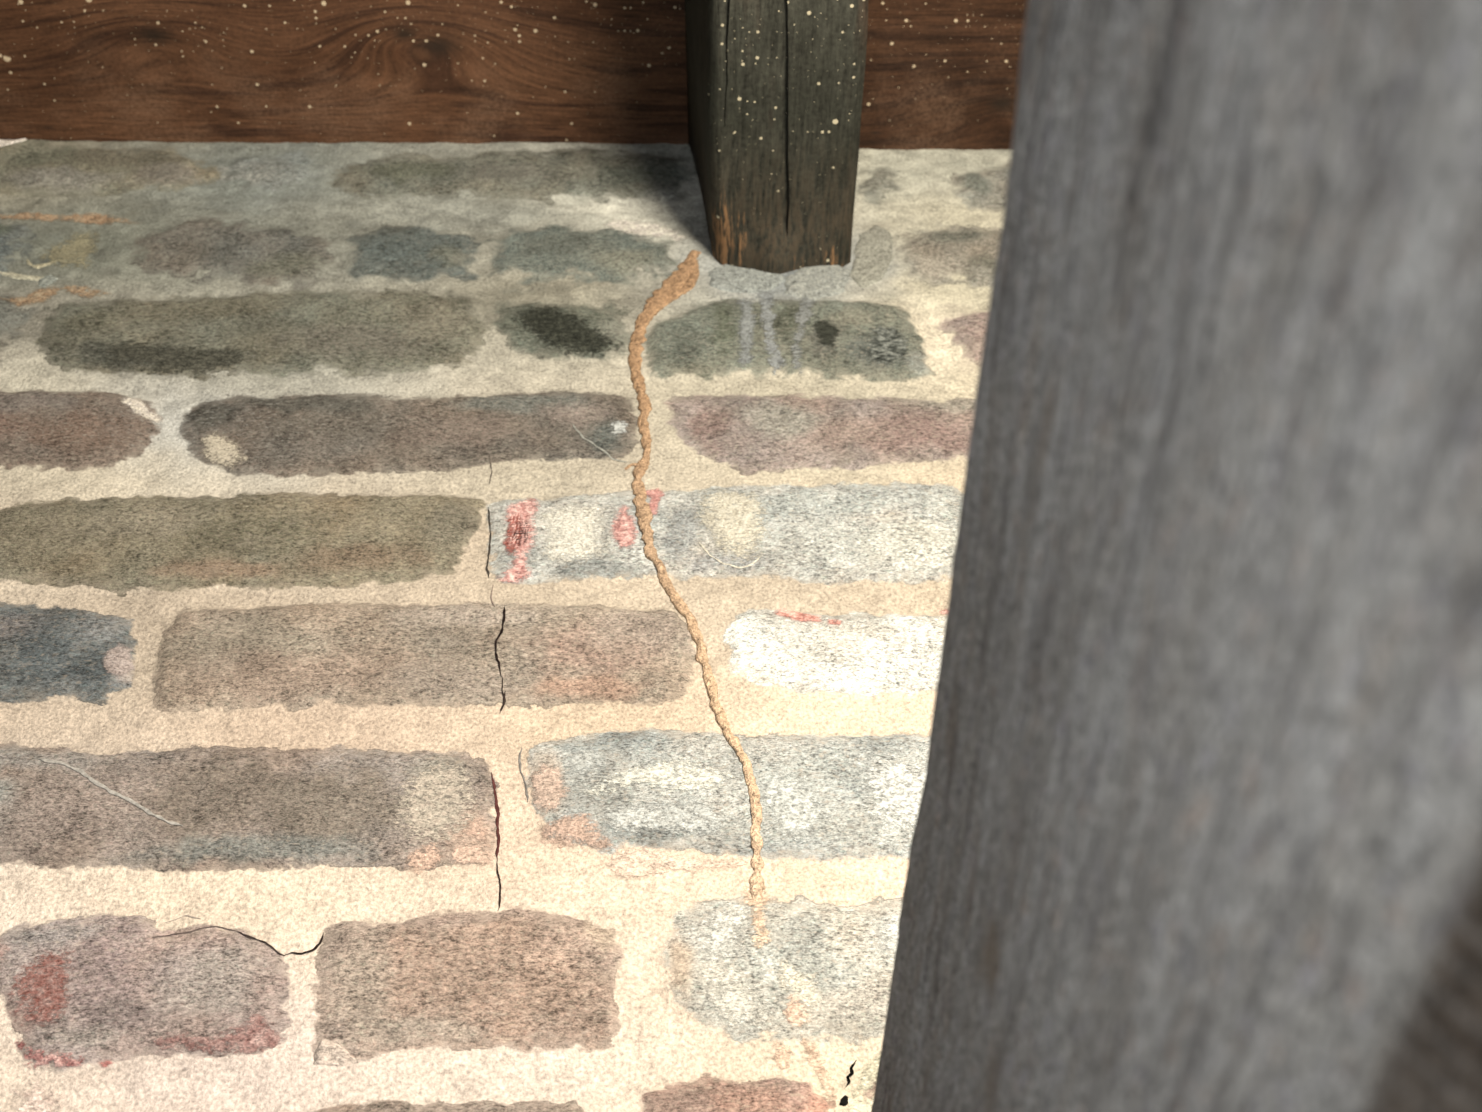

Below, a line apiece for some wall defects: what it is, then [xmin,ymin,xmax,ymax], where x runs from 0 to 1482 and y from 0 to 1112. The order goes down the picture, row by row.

crack [486,455,506,712]
crack [491,748,529,910]